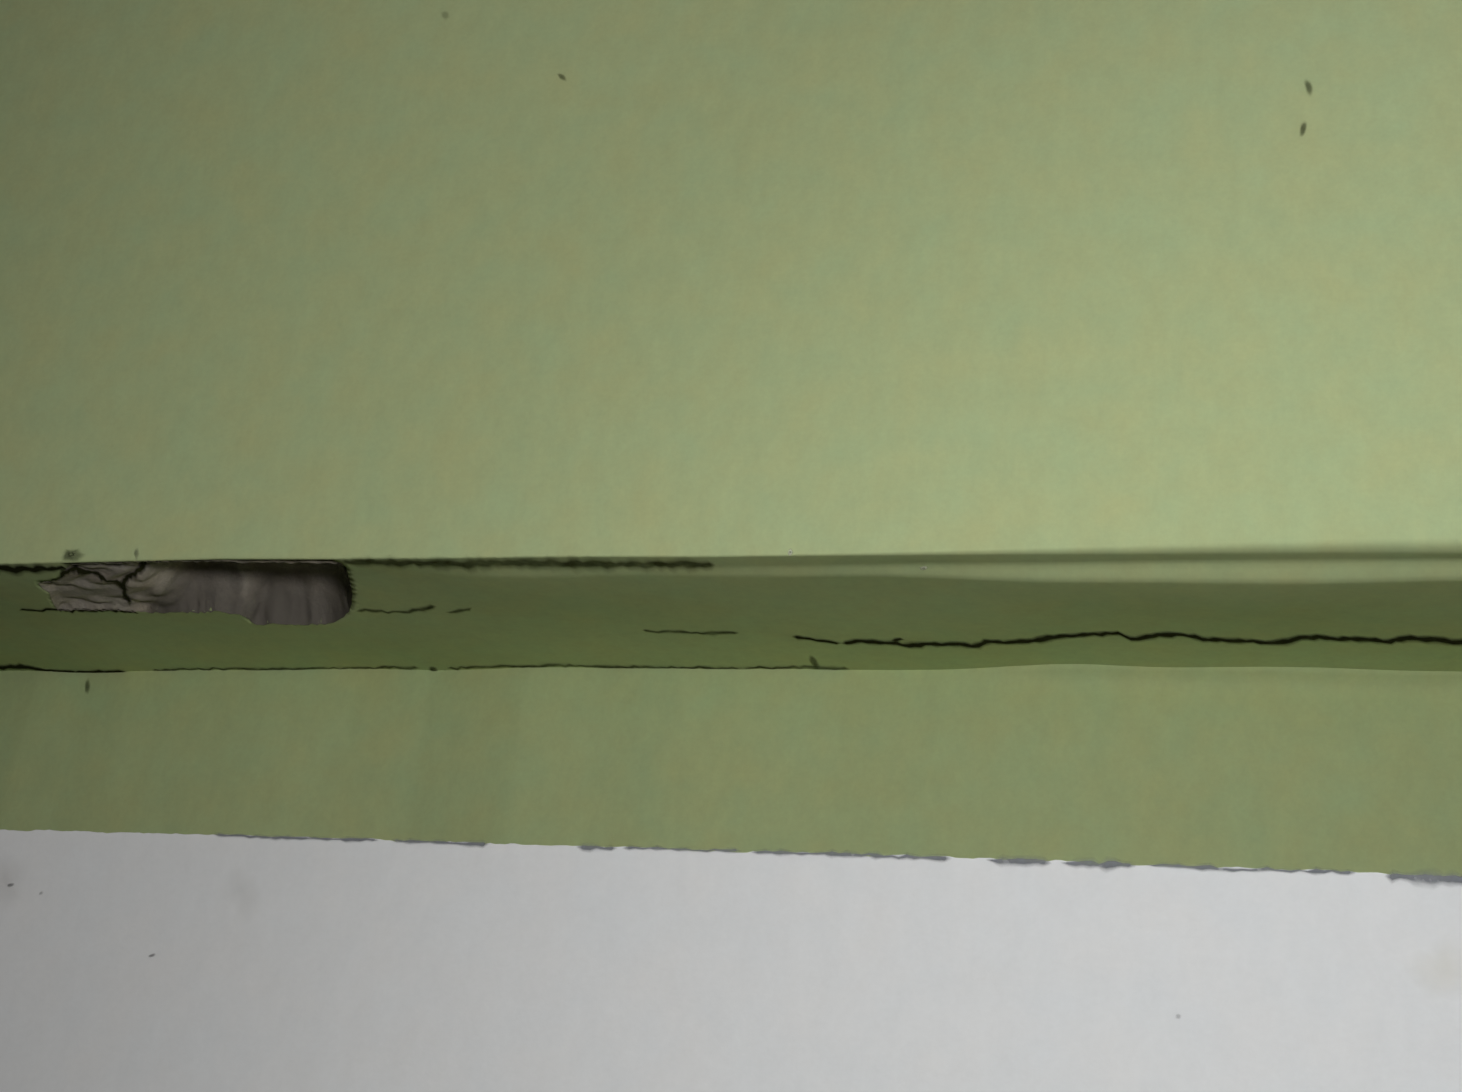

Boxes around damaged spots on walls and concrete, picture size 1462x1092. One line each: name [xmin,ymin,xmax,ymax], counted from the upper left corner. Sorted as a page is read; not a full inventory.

flaking render [38,550,353,625]
crack [0,630,1462,673]